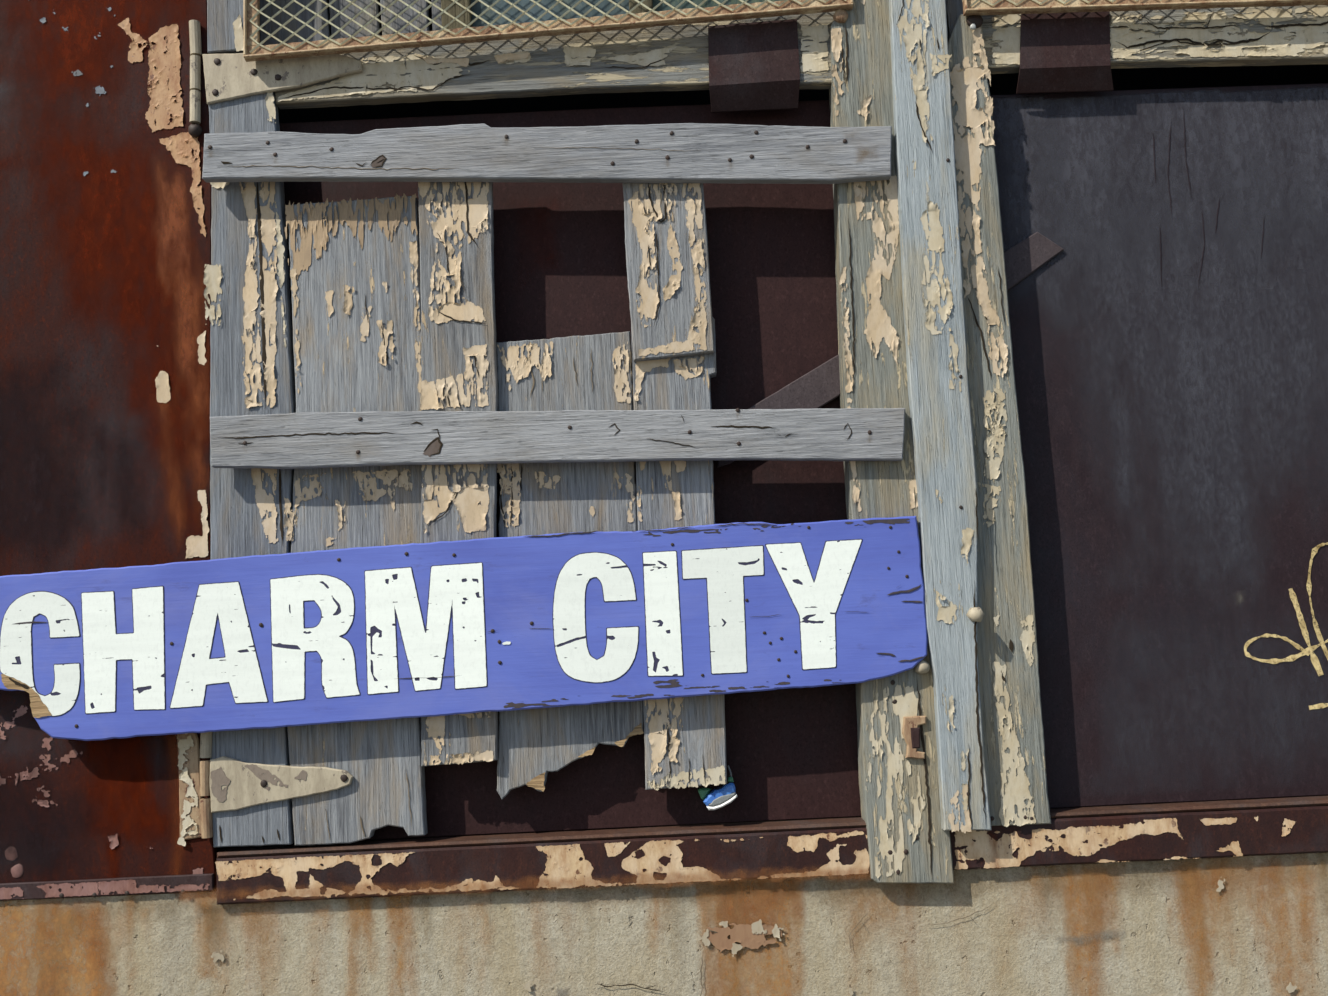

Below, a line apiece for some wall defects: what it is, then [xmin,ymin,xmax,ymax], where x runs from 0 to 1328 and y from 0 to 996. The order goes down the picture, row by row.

corrosion [20,0,185,99]
peeling [1110,7,1328,59]
peeling [108,7,553,410]
corrosion [42,134,210,482]
peeling [612,183,707,403]
peeling [897,0,1021,566]
peeling [251,463,561,547]
corrosion [89,737,180,837]
peeling [947,658,1182,870]
peeling [0,852,516,900]
peeling [536,839,741,889]
corrosion [715,876,796,996]